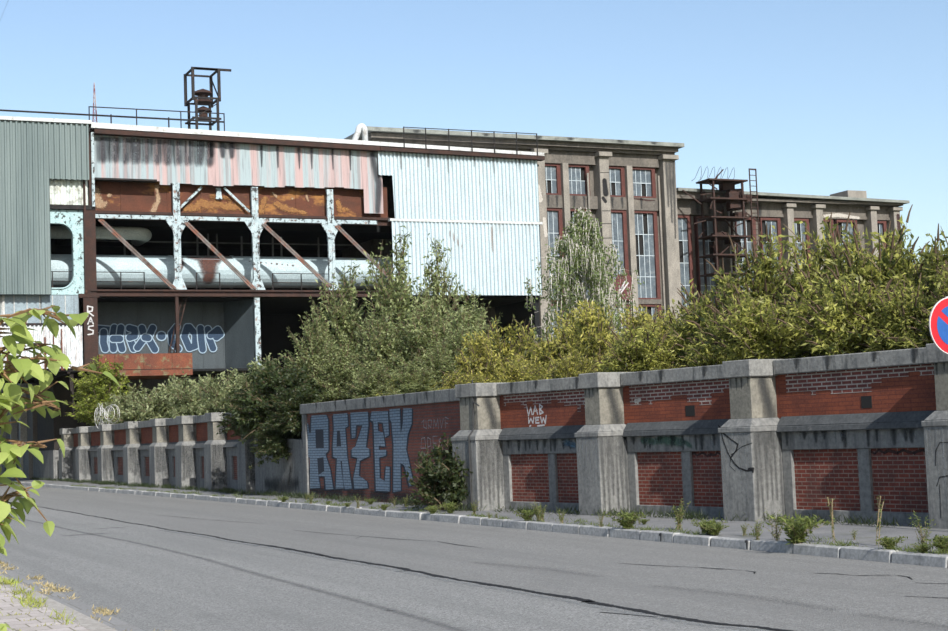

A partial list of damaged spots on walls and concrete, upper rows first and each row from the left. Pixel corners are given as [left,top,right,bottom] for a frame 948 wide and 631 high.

peeling [184,194,243,212]
peeling [259,192,309,214]